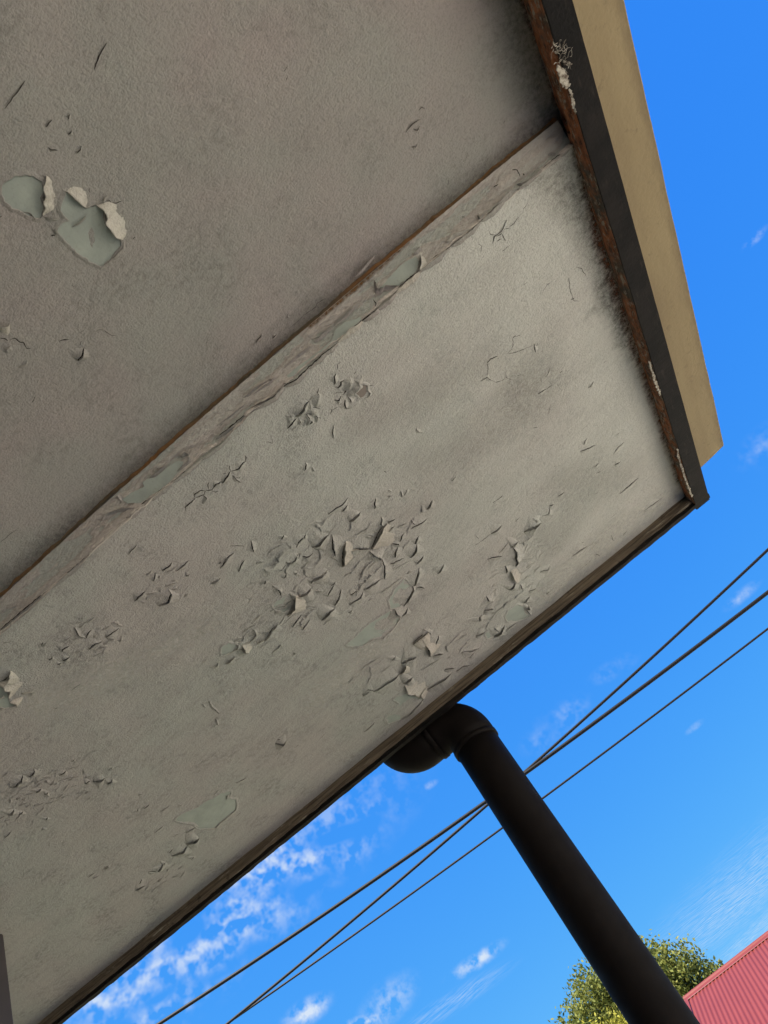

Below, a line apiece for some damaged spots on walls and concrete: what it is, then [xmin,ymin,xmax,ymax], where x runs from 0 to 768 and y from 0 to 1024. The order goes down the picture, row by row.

peeling [0,170,135,270]
peeling [102,150,569,521]
crack [481,335,562,428]
rust [580,174,679,481]
peeling [0,558,85,643]
peeling [39,617,123,666]
peeling [203,489,448,669]
peeling [348,490,564,732]
peeling [0,671,33,711]
peeling [0,759,118,838]
peeling [135,825,203,894]